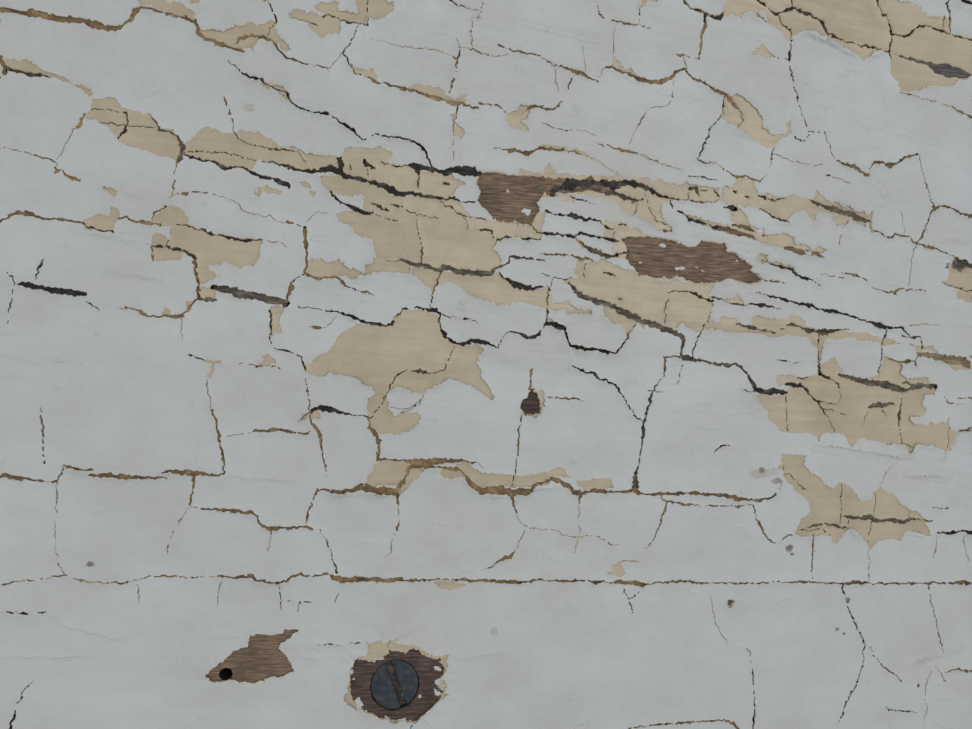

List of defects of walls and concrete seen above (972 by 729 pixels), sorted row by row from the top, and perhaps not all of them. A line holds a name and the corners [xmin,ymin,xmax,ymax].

peeling [138,0,290,52]
peeling [289,0,394,38]
crack [0,0,850,183]
peeling [683,0,972,95]
crack [945,0,972,32]
crack [759,16,972,295]
peeling [2,56,972,454]
crack [0,147,972,729]
peeling [438,461,613,491]
peeling [778,454,930,550]
peeling [205,629,298,683]
peeling [344,639,448,724]